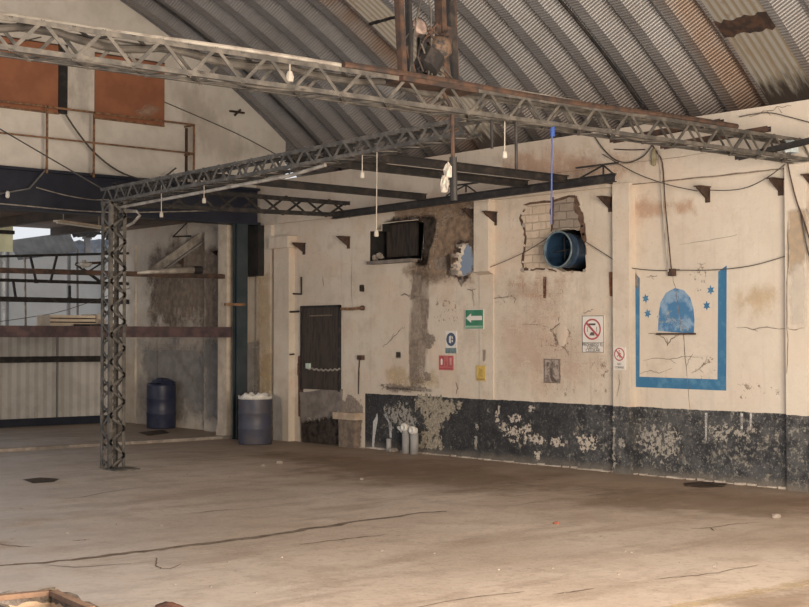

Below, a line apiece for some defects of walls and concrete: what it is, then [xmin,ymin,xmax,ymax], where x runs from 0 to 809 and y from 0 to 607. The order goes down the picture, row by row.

leakage [148,239,218,327]
leakage [395,201,474,386]
spalling [434,240,473,286]
flaking render [519,195,587,273]
leakage [144,337,218,421]
peeling [381,372,463,453]
peeling [495,405,567,461]
peeling [573,433,600,453]
peeling [612,412,625,469]
peeling [636,418,690,468]
peeling [708,423,755,443]
crack [0,511,447,569]